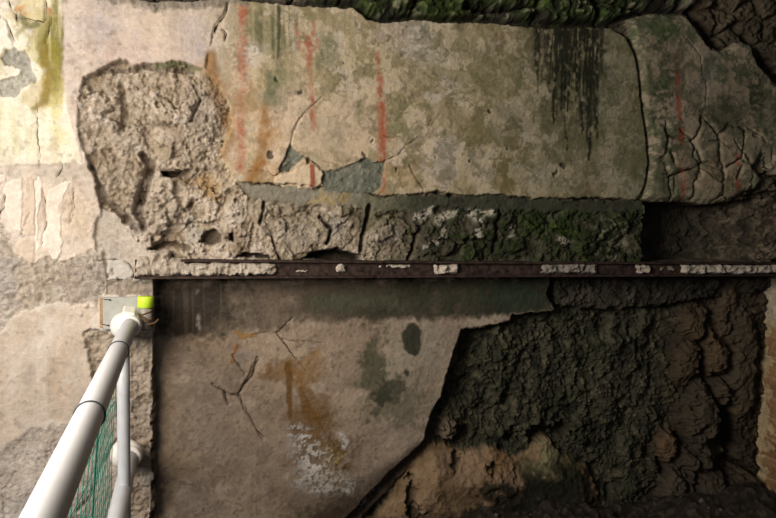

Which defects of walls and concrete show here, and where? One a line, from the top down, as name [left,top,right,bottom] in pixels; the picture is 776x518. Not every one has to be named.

leakage [33,35,62,109]
leakage [534,27,605,161]
flaking render [0,61,776,332]
crack [665,133,769,194]
flaking render [83,329,115,379]
flaking render [130,334,155,518]
crack [214,357,263,436]
rust [282,361,348,480]
leakage [288,424,396,518]